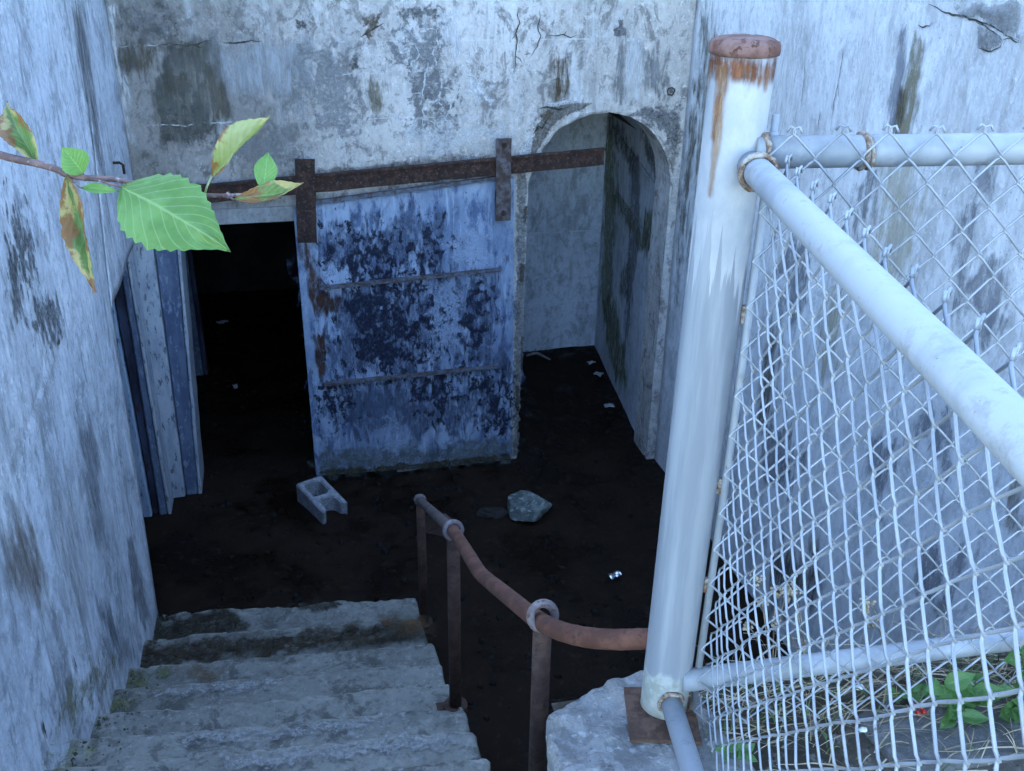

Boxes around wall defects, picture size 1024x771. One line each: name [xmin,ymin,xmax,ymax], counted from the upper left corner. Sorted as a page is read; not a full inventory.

damp [108,1,381,143]
crack [512,7,576,75]
corrosion [709,55,777,195]
damp [889,28,924,134]
crack [919,4,1019,52]
damp [609,39,683,357]